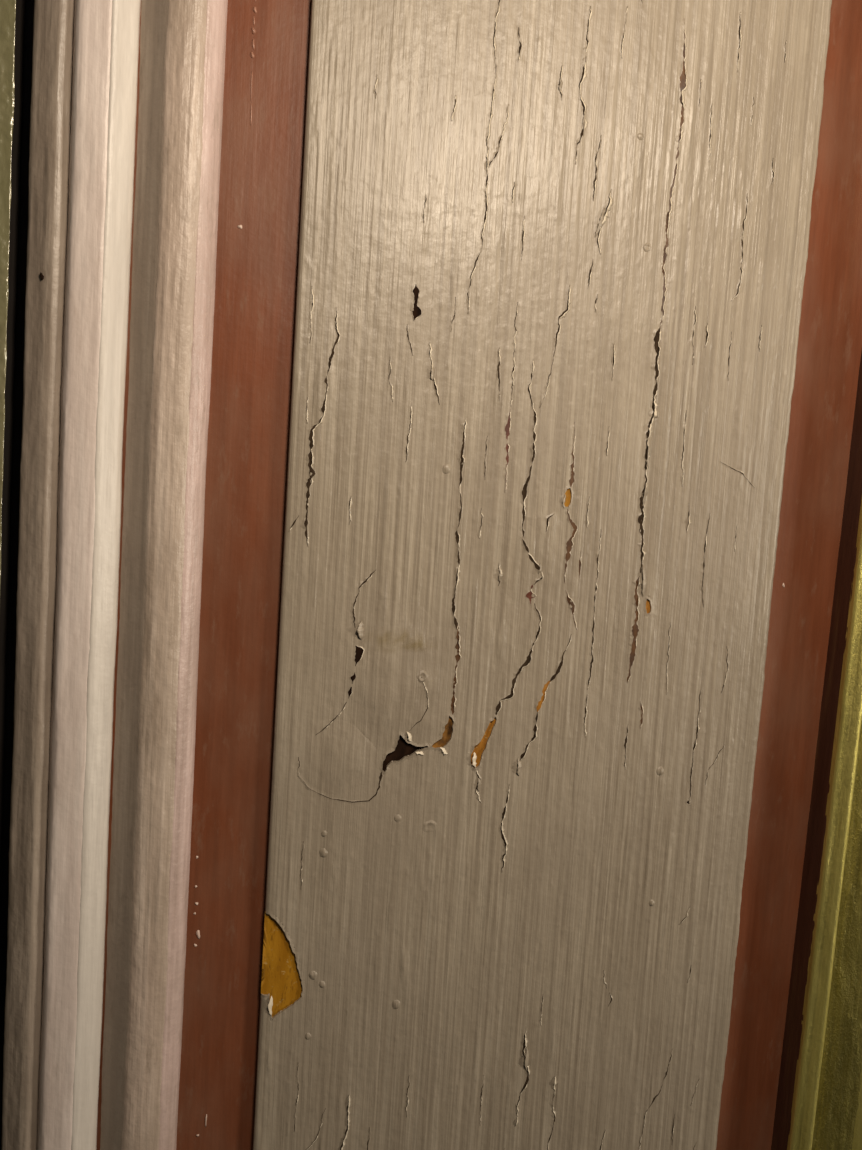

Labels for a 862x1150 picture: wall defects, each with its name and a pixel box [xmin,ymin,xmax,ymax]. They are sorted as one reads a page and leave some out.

crack [387,0,526,463]
crack [730,158,775,302]
crack [288,286,341,547]
crack [409,6,614,873]
crack [622,18,738,770]
crack [690,306,763,381]
peeling [407,713,457,755]
peeling [467,715,500,773]
crack [688,646,729,806]
peeling [261,910,305,1021]
crack [293,1062,371,1150]
crack [503,994,558,1150]